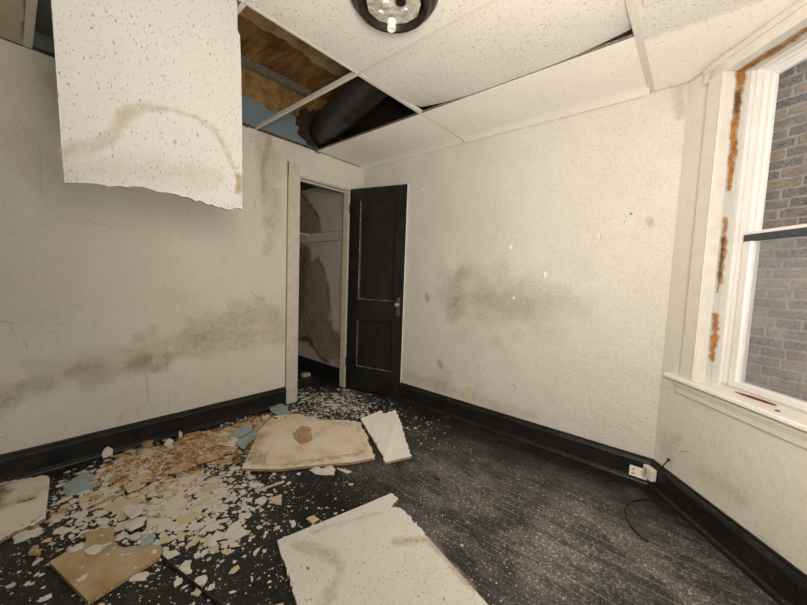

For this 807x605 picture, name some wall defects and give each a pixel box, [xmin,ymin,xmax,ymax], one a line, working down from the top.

spalling [295,107,321,149]
rust [727,28,807,190]
rust [717,218,727,293]
rust [710,314,719,361]